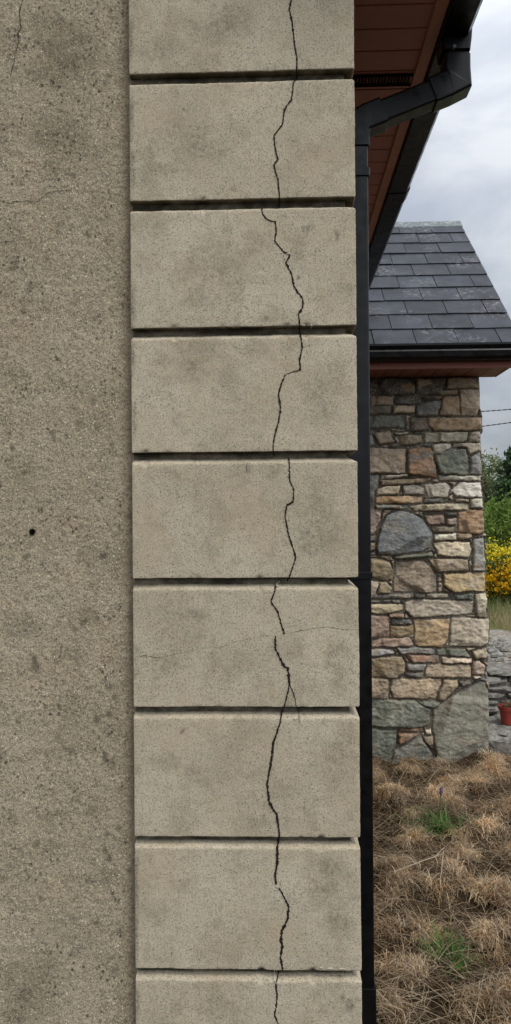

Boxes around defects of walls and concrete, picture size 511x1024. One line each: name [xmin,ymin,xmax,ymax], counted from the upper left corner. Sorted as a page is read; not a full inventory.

crack [135,0,355,1024]